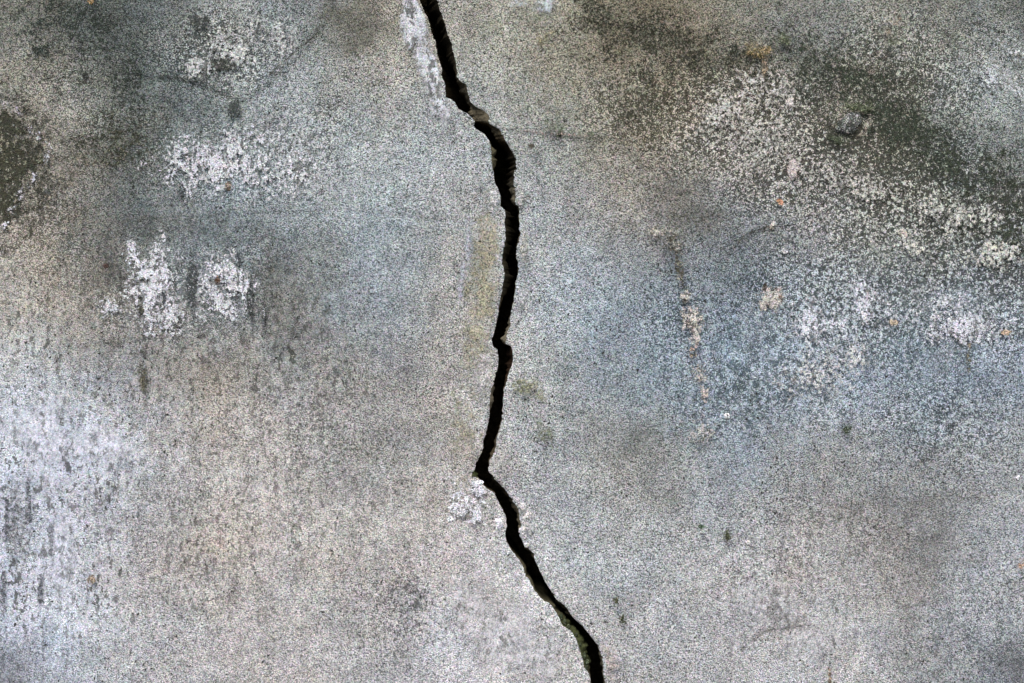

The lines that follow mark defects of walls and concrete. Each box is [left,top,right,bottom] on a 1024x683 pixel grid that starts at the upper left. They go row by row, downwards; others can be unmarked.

crack [420,0,647,683]
leakage [537,0,1024,259]